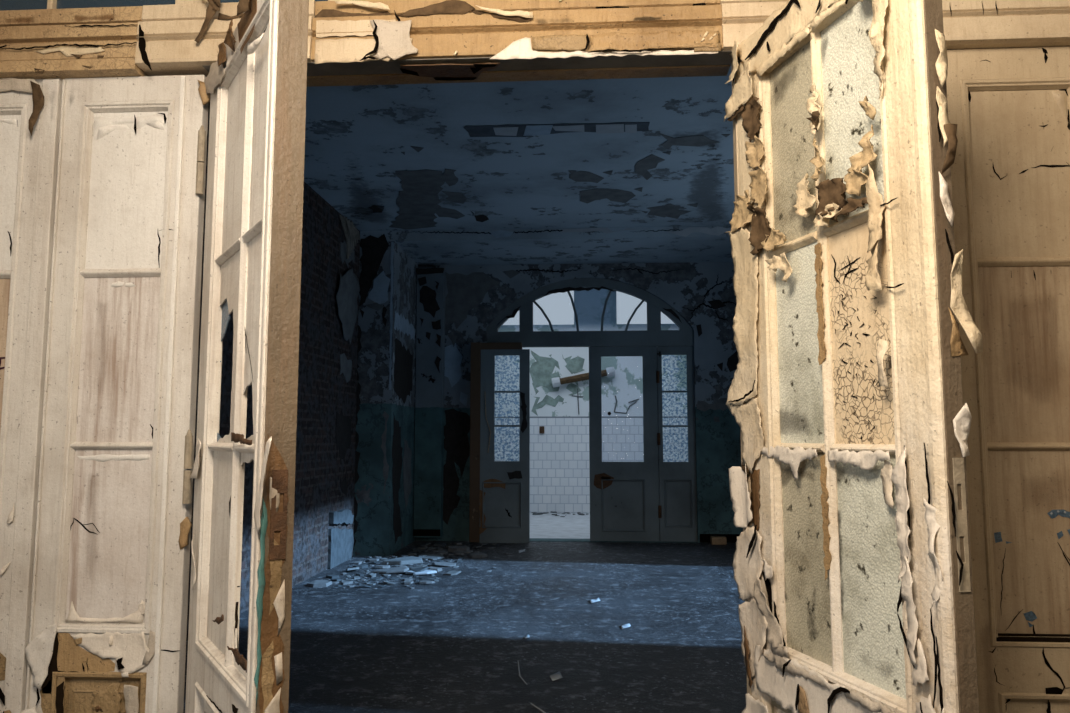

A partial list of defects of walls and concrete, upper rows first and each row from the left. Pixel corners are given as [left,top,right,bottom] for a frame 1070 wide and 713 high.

peeling [194,0,257,70]
peeling [490,0,888,121]
peeling [568,133,730,203]
peeling [642,203,698,219]
peeling [865,163,886,291]
crack [993,89,1070,180]
flaking render [336,169,489,550]
peeling [530,351,585,416]
crack [831,254,904,440]
peeling [707,228,944,713]
peeling [21,624,156,713]
crack [1033,624,1065,713]